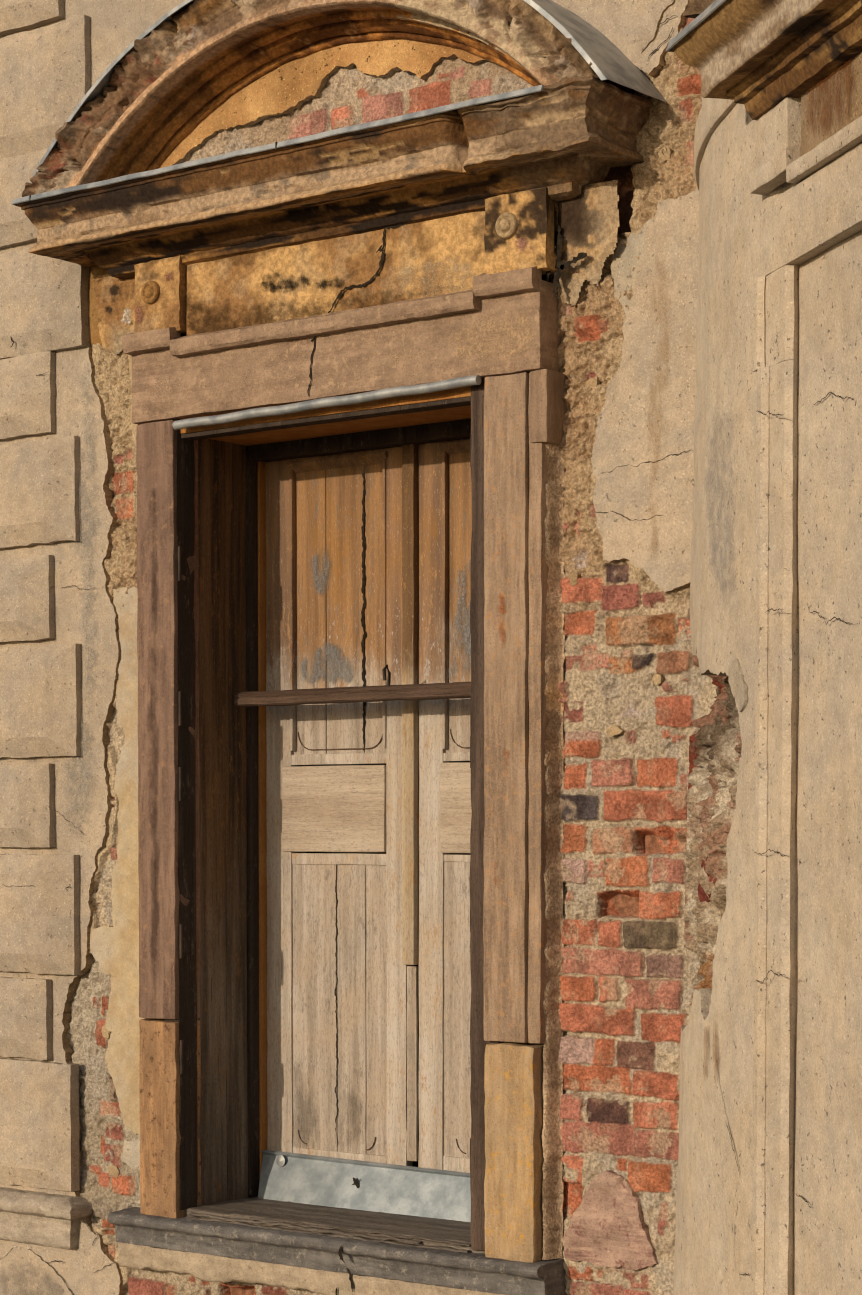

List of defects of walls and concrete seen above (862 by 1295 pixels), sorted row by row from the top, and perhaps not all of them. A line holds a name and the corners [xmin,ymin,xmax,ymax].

crack [634,15,678,62]
peeling [121,307,143,324]
crack [307,224,403,396]
spalling [91,343,137,620]
crack [596,511,661,521]
crack [602,450,694,486]
spalling [549,52,748,1295]
spalling [90,694,125,929]
spalling [67,945,322,1295]
crack [0,1219,111,1295]